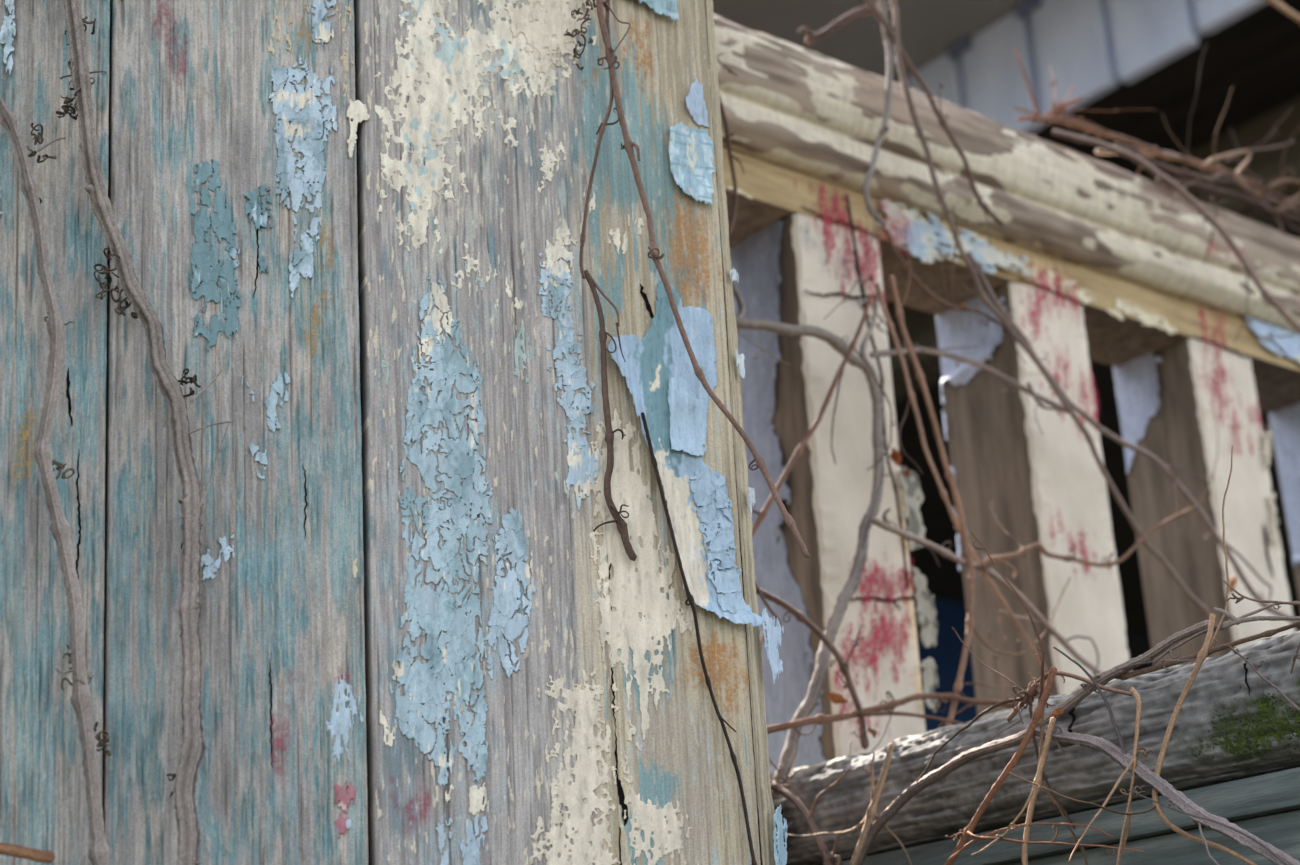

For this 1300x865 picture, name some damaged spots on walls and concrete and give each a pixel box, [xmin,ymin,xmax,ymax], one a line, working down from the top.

peeling [639,0,679,21]
peeling [189,0,597,352]
peeling [669,14,1300,364]
peeling [326,212,826,865]
peeling [935,292,1006,441]
peeling [1113,351,1162,474]
peeling [1263,402,1300,567]
crack [1068,707,1076,745]
crack [1243,658,1251,696]